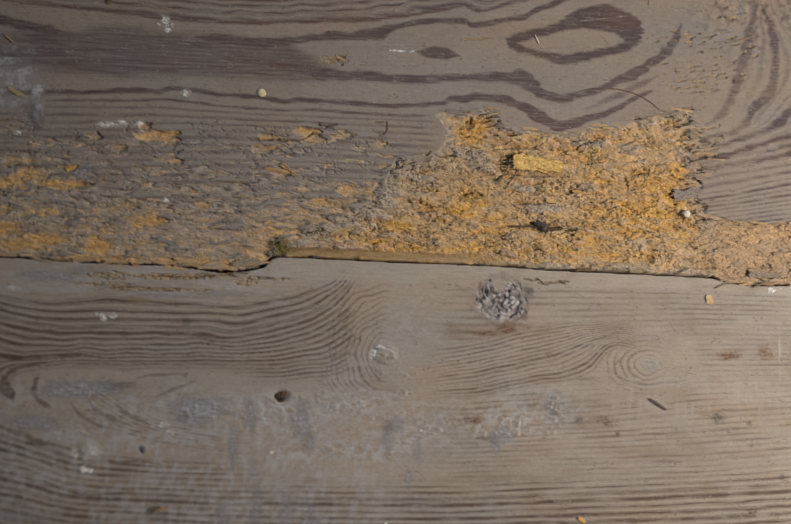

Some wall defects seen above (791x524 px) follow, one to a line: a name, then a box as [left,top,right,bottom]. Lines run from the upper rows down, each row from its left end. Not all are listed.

peeling [626,107,791,228]
peeling [719,248,791,286]